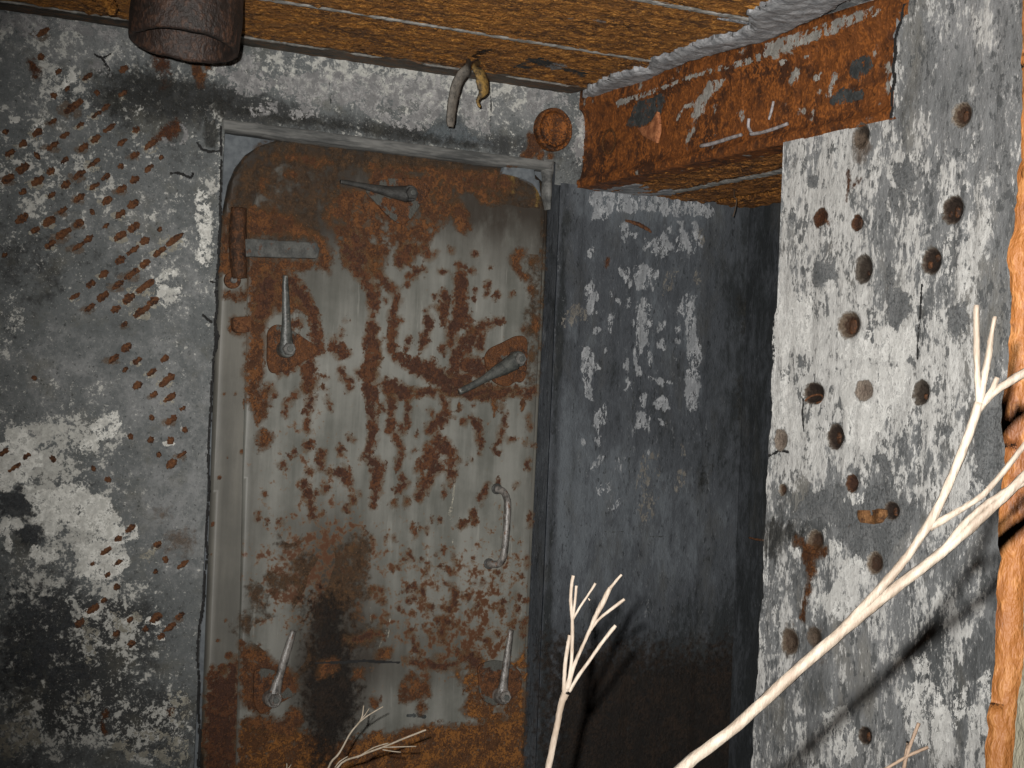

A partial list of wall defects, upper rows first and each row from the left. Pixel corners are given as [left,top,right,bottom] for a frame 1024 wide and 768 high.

crack [890,3,907,119]
rust [0,72,184,329]
rust [638,112,661,143]
rust [846,134,869,202]
rust [223,132,553,520]
peeling [561,191,715,433]
rust [104,342,188,469]
peeling [581,346,607,474]
leakage [0,483,45,545]
rust [458,475,519,530]
rust [201,511,529,768]
rust [794,534,828,648]